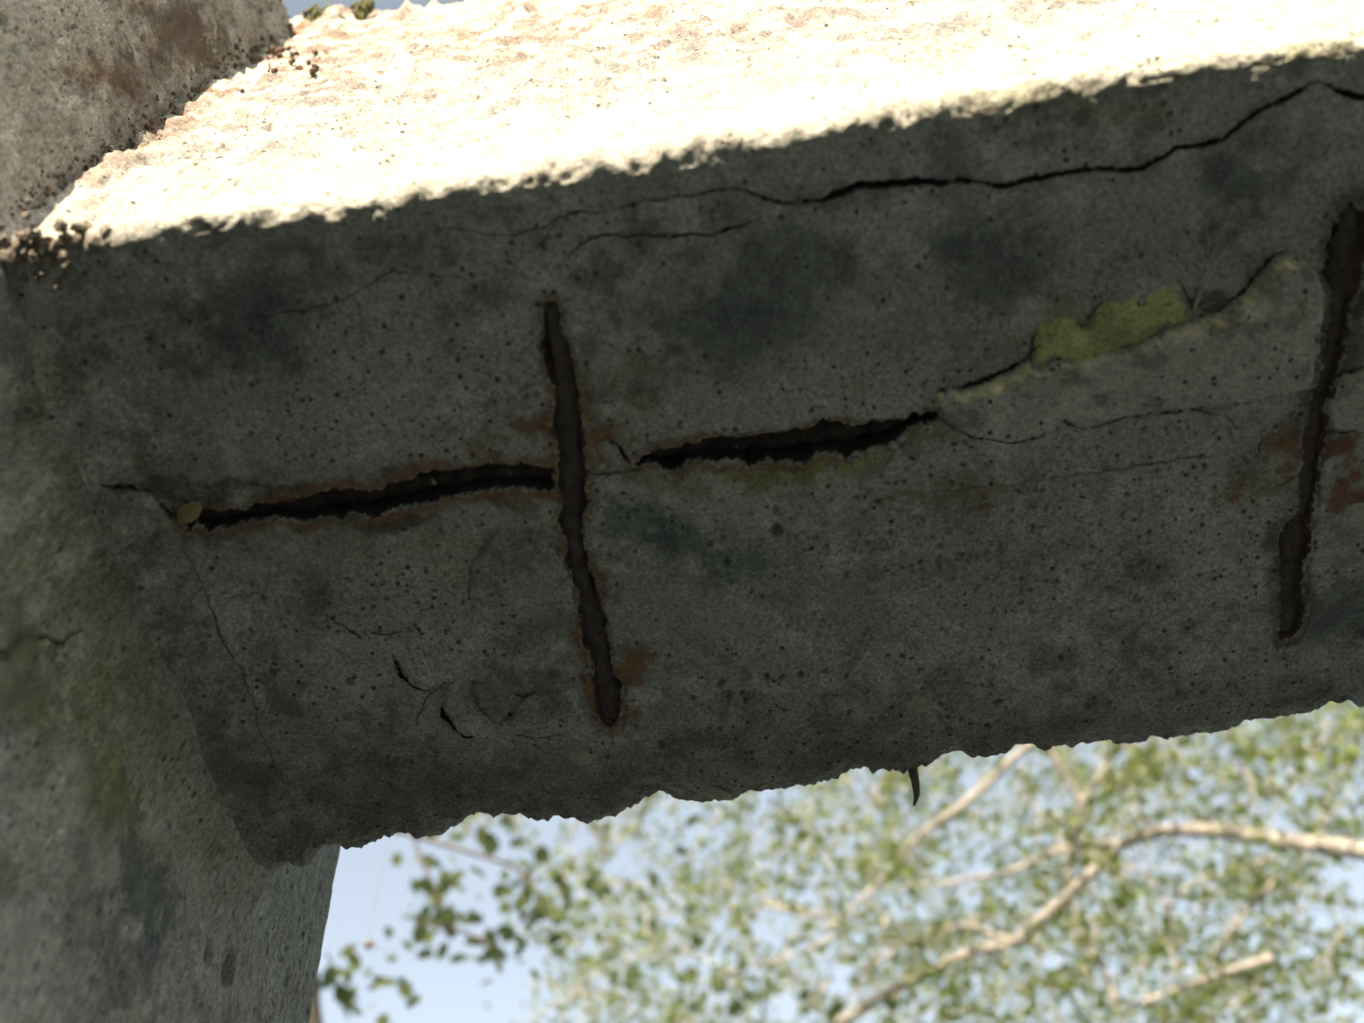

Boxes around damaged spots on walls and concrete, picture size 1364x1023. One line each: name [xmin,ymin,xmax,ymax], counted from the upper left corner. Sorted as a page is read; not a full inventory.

crack [436,81,1364,269]
crack [1227,249,1287,303]
corrosion [200,414,552,519]
crack [590,429,643,476]
corrosion [627,408,942,476]
crack [871,329,1299,503]
corrosion [1264,205,1364,646]